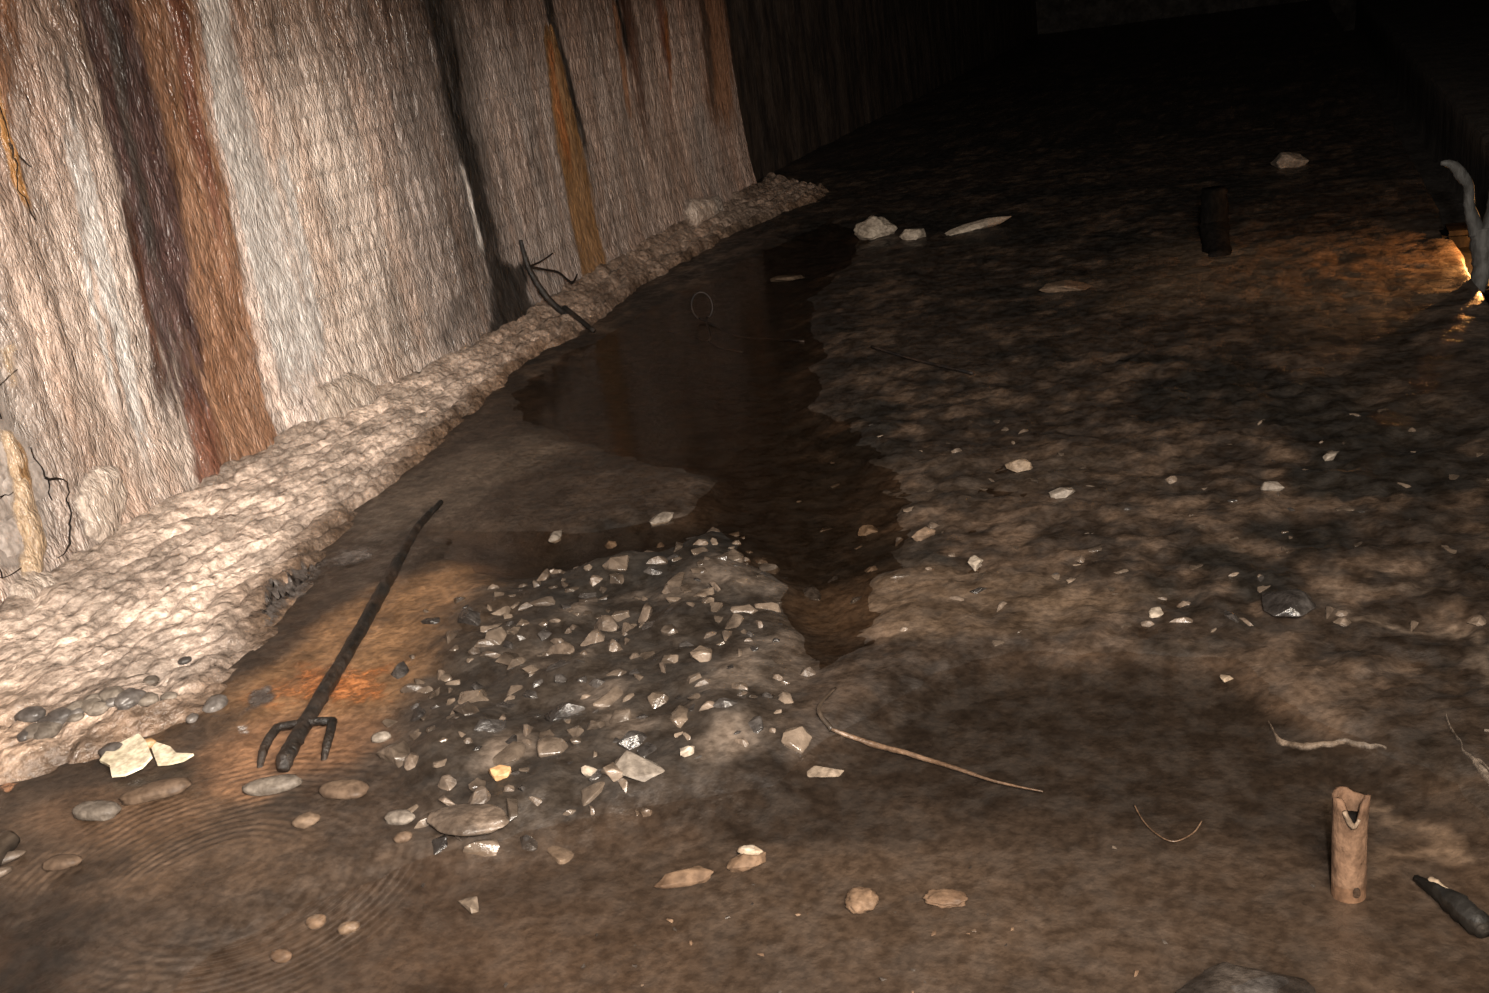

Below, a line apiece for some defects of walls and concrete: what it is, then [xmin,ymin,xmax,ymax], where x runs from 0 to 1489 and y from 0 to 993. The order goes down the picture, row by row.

corrosion [125,0,277,483]
corrosion [544,0,606,275]
crack [0,447,72,558]